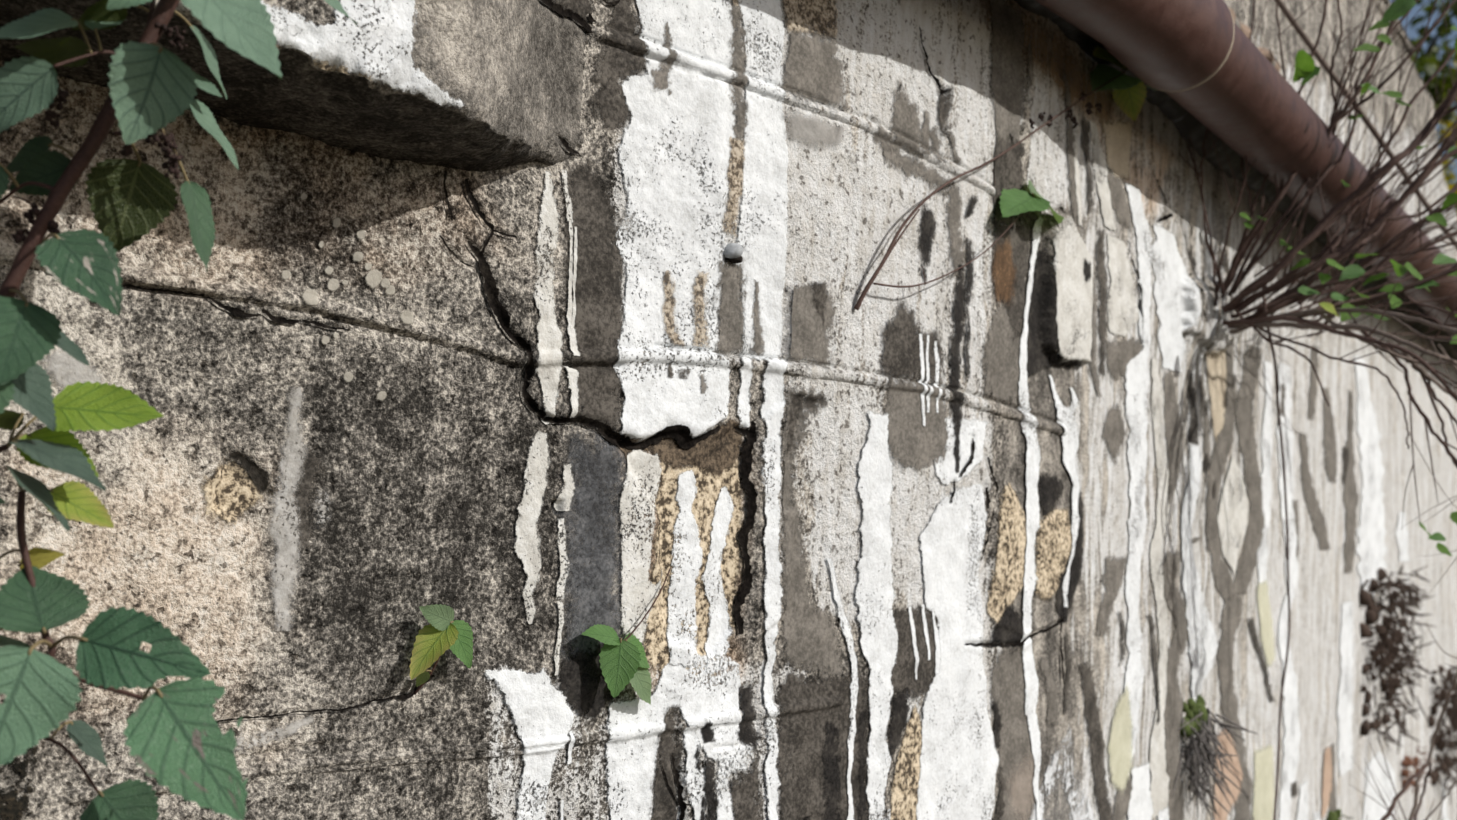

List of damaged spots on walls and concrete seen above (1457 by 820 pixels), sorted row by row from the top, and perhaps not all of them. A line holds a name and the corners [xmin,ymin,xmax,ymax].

crack [541,0,620,33]
crack [121,284,348,330]
crack [439,171,758,634]
leakage [514,0,1359,820]
spalling [203,451,270,524]
spalling [618,419,744,676]
spalling [987,483,1072,622]
crack [216,675,435,723]